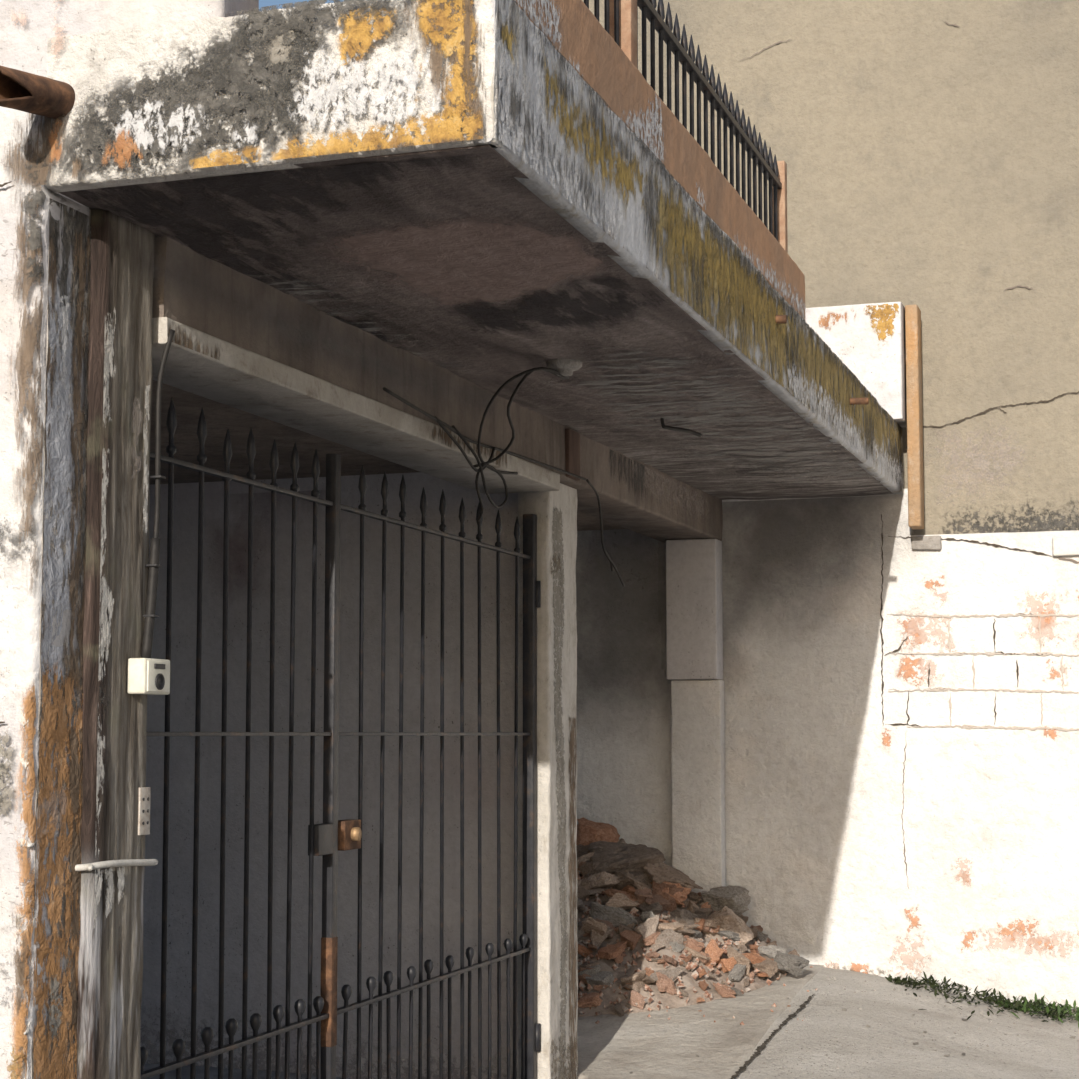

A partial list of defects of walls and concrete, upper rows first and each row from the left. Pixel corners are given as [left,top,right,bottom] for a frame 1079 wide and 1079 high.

damp [498,0,903,460]
damp [0,0,405,715]
damp [573,348,871,482]
crack [923,391,1079,428]
flaking render [925,576,947,601]
flaking render [1025,594,1058,644]
flaking render [898,616,955,686]
peeling [19,749,29,770]
flaking render [961,919,1071,956]